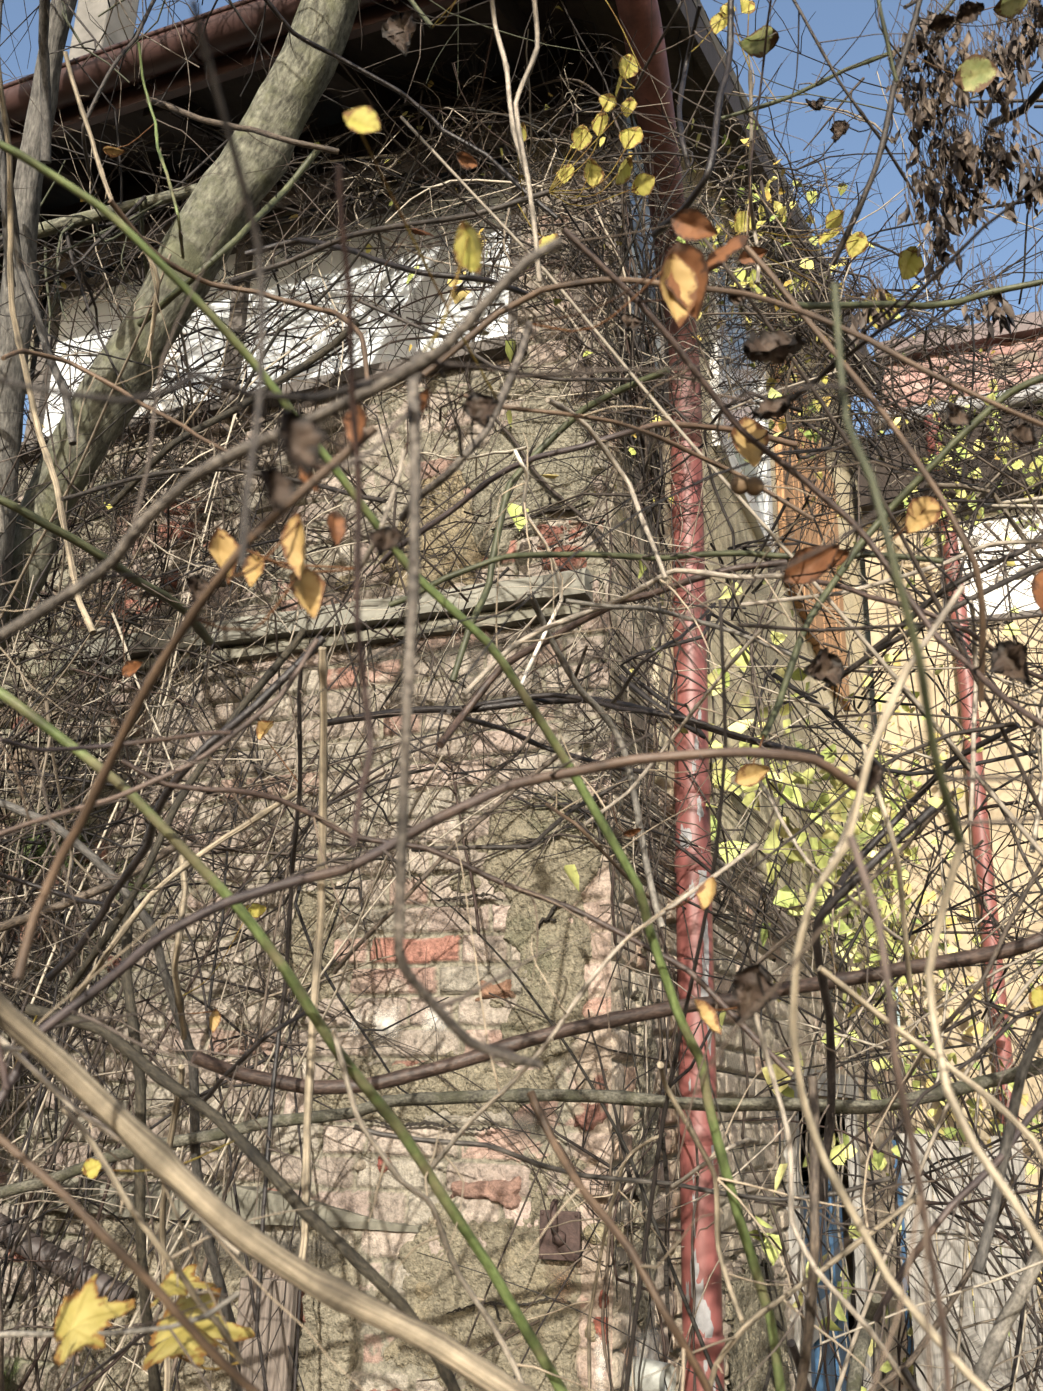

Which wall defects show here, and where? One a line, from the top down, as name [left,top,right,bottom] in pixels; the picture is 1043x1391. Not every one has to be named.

flaking render [312,789,635,1131]
flaking render [308,1229,361,1290]
flaking render [293,1293,402,1391]
spalling [354,1156,392,1173]
flaking render [376,1151,613,1391]
flaking render [624,986,660,1332]